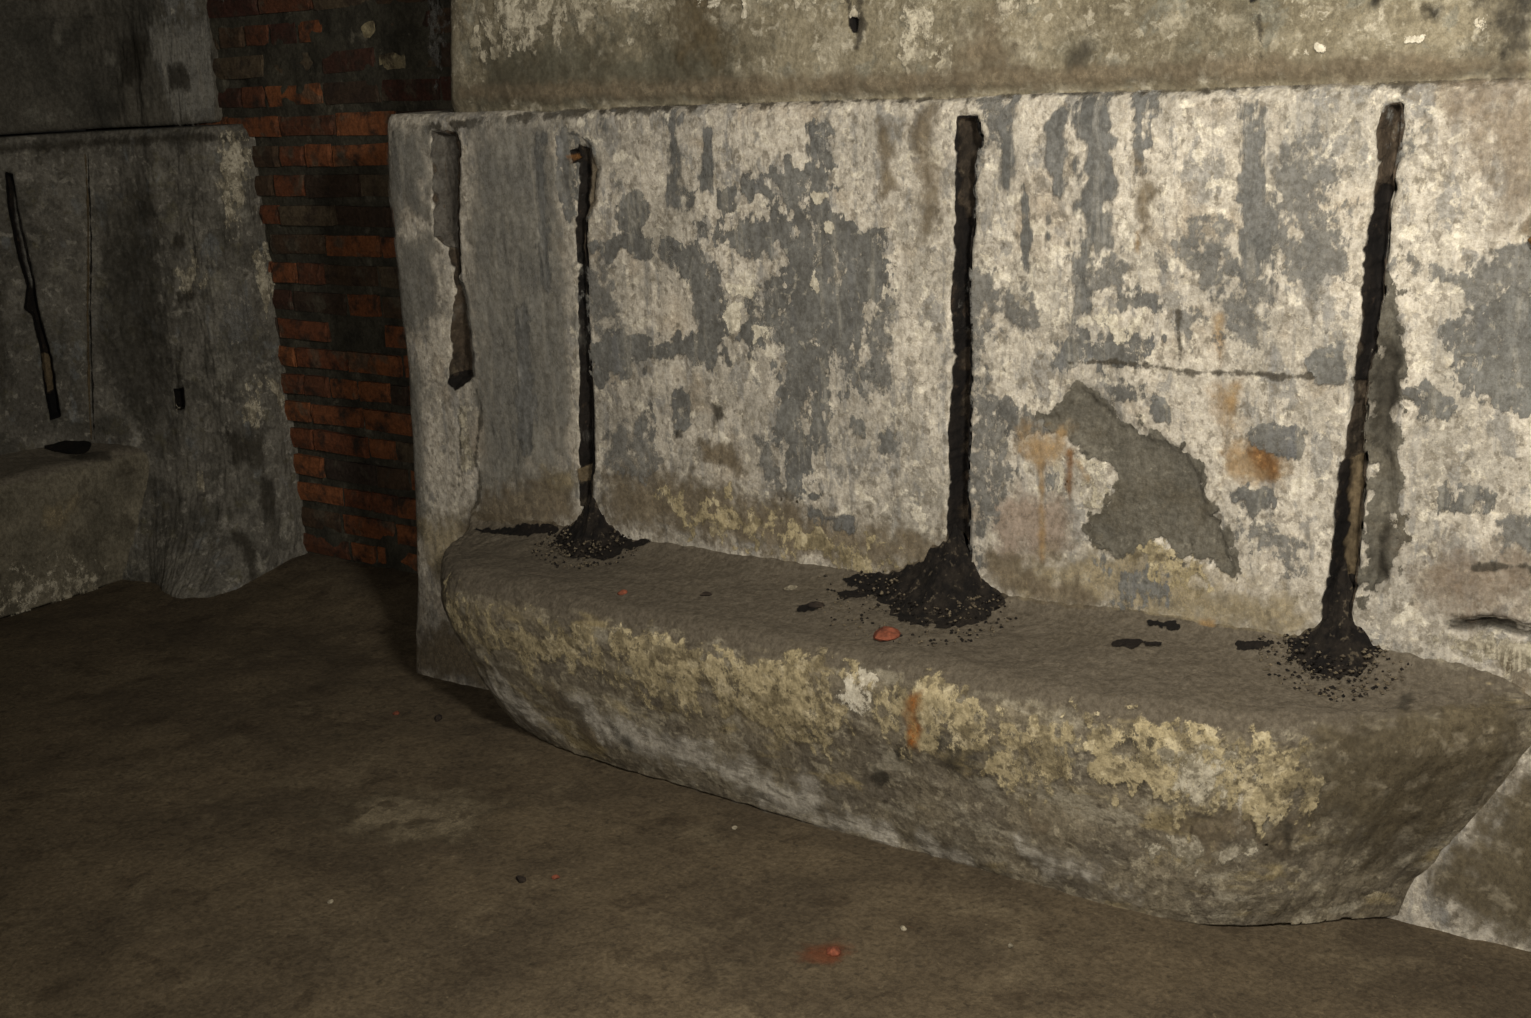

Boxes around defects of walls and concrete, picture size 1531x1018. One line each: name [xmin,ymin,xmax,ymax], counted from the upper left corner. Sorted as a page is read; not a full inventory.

crack [741,0,749,19]
crack [847,0,866,49]
leakage [389,127,436,332]
leakage [410,0,1531,948]
rust [1226,447,1281,480]